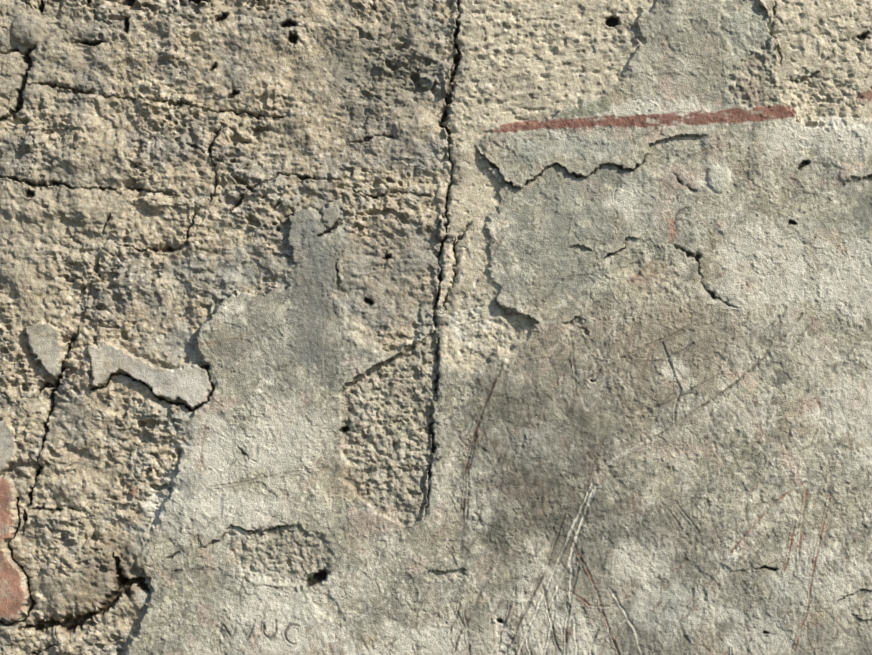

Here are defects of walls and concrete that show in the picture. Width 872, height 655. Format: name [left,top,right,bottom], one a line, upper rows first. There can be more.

crack [0,0,473,534]